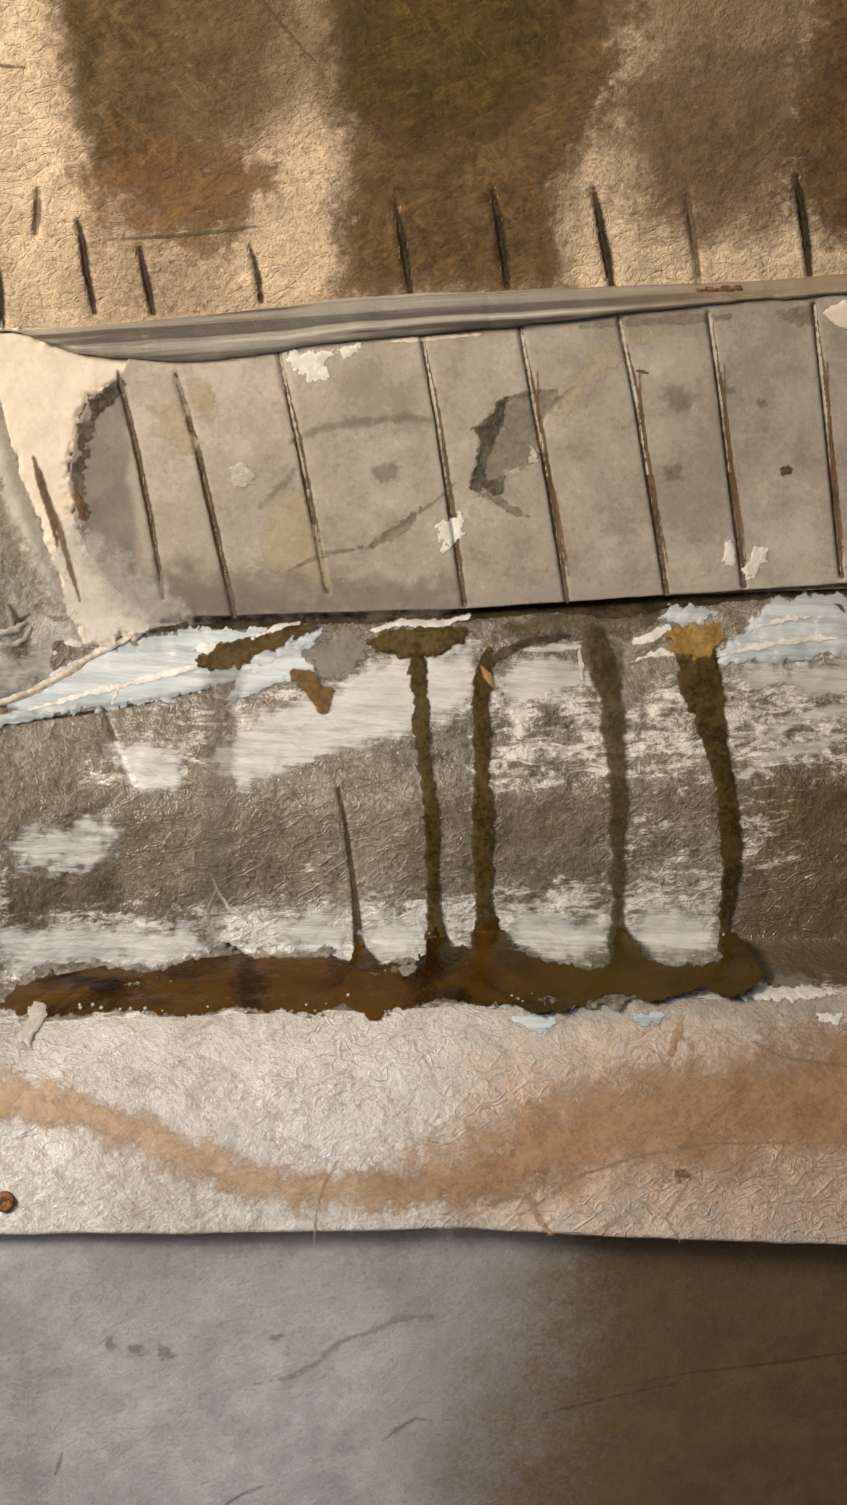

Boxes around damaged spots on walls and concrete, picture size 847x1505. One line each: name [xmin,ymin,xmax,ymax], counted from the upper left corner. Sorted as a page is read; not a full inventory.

crack [0,273,8,328]
crack [32,189,40,236]
water stain [61,0,276,254]
crack [76,219,263,315]
spalling [296,486,451,568]
peeling [434,510,465,554]
spalling [469,390,566,517]
crack [519,327,569,603]
water stain [328,0,847,297]
crack [592,186,669,596]
crack [795,174,844,578]
water stain [26,588,847,961]